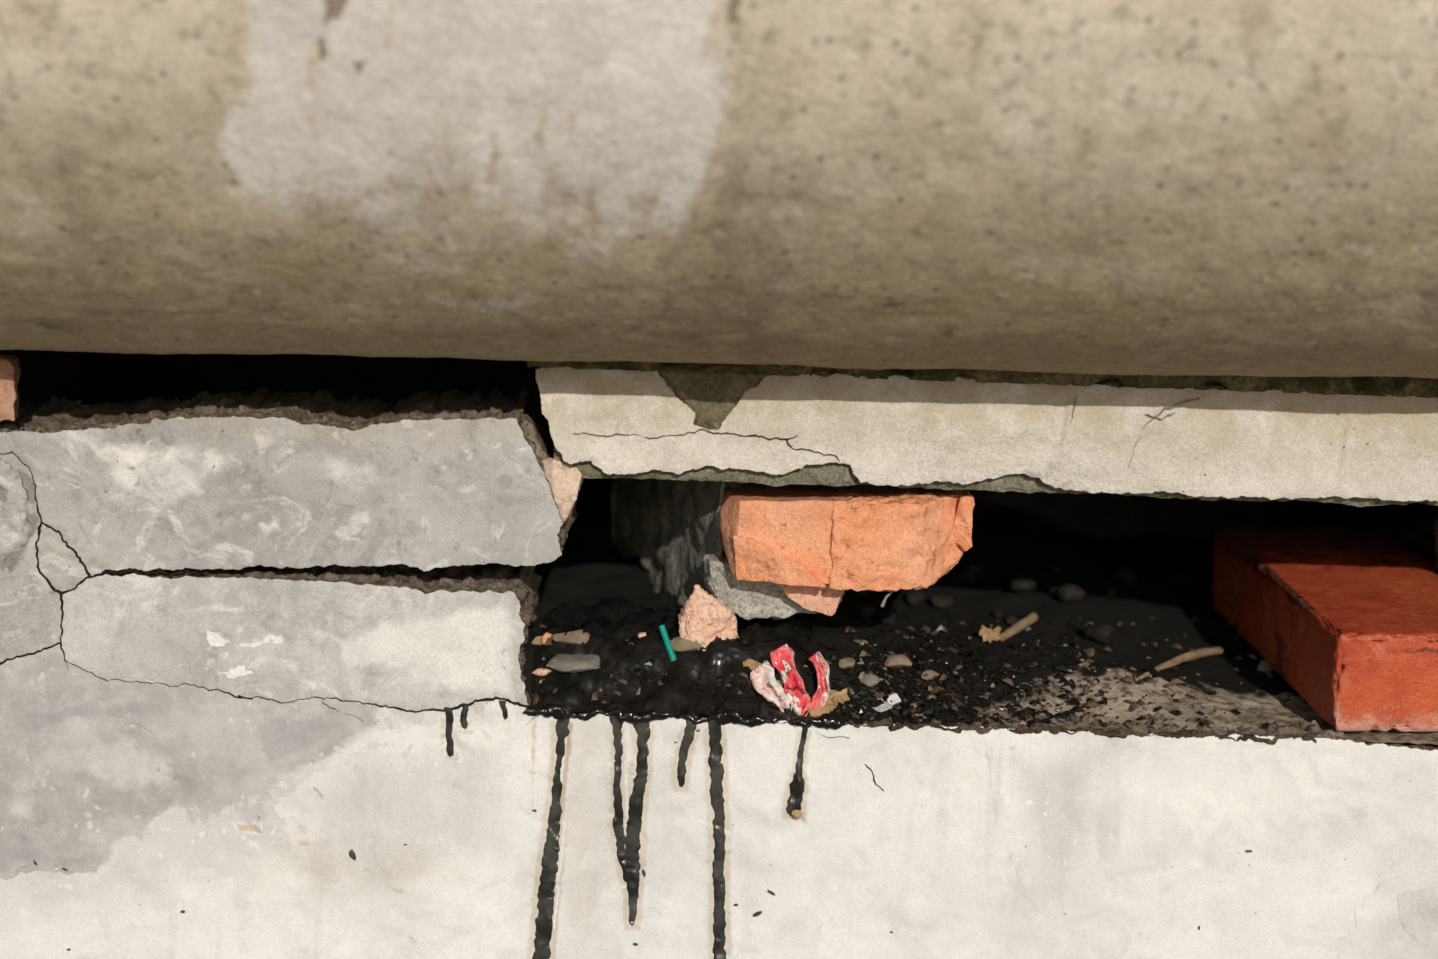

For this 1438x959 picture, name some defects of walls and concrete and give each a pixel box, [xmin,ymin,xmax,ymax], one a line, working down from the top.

crack [573,429,840,462]
crack [0,451,529,747]